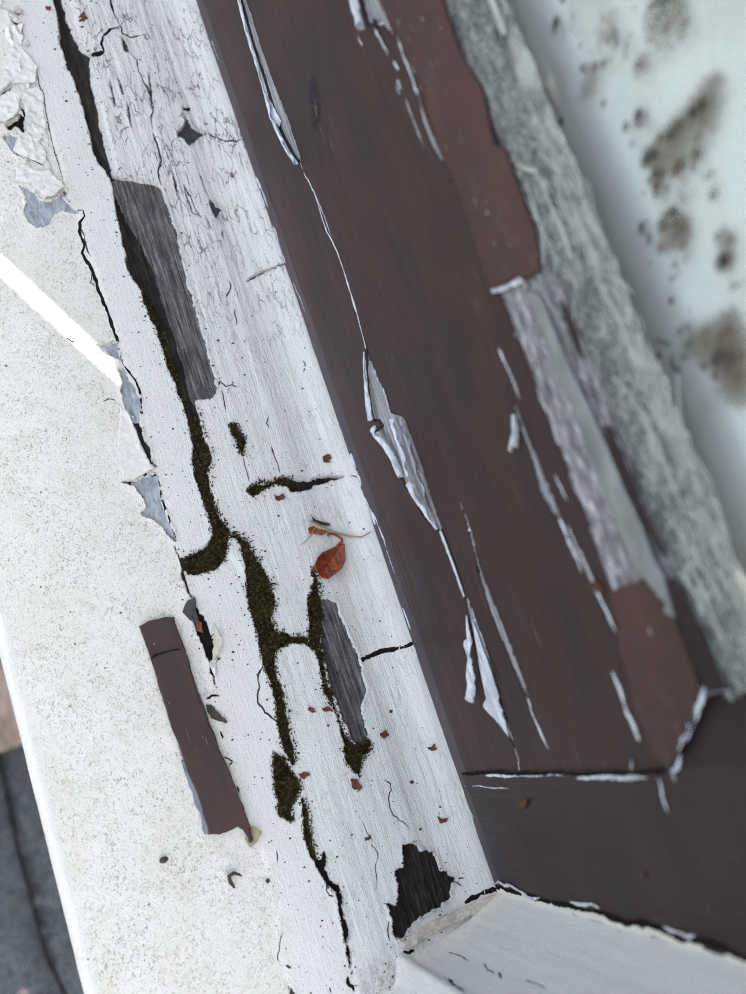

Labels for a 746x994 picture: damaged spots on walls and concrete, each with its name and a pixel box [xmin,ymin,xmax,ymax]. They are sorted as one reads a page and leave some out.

peeling [0,0,78,228]
crack [53,0,242,576]
crack [244,416,357,498]
peeling [237,0,525,771]
peeling [499,349,616,631]
mould [580,0,689,75]
mould [639,75,720,282]
mould [656,312,746,399]
mould [715,232,735,272]
peeling [460,503,548,748]
crack [461,678,706,813]
crack [299,797,355,992]